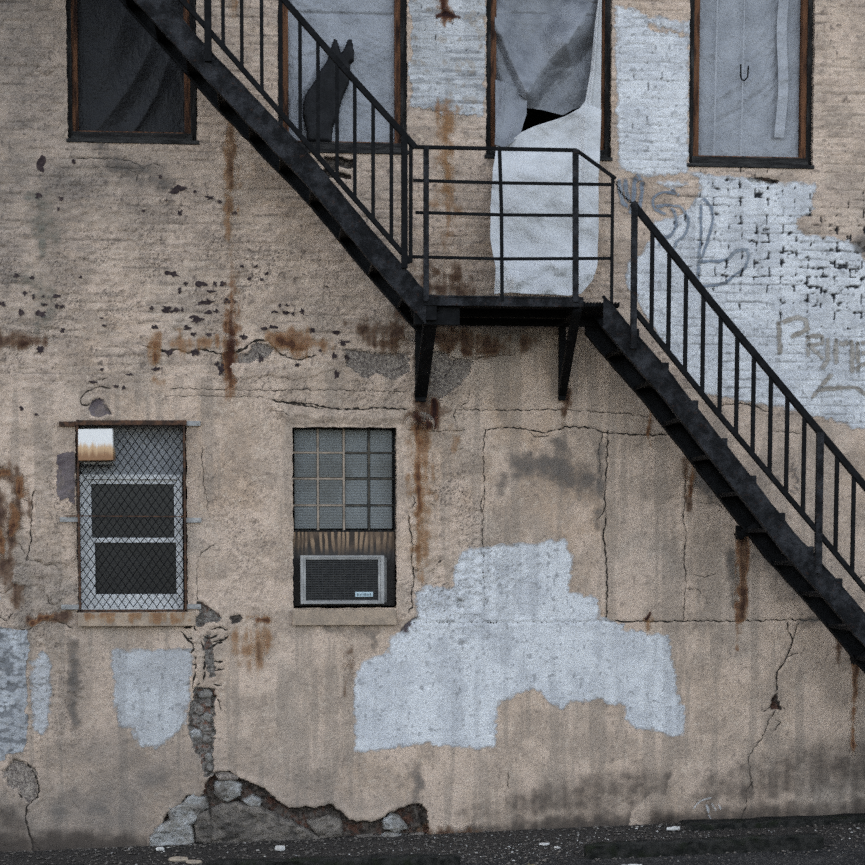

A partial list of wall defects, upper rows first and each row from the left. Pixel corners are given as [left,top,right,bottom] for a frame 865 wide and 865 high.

corrosion [436,0,461,26]
corrosion [149,279,241,398]
corrosion [0,462,31,608]
peeling [0,627,39,803]
corrosion [26,610,72,626]
flaking render [188,601,243,777]
corrosion [405,397,445,561]
crack [170,387,819,810]
corrosion [734,536,749,624]
crack [19,763,40,843]